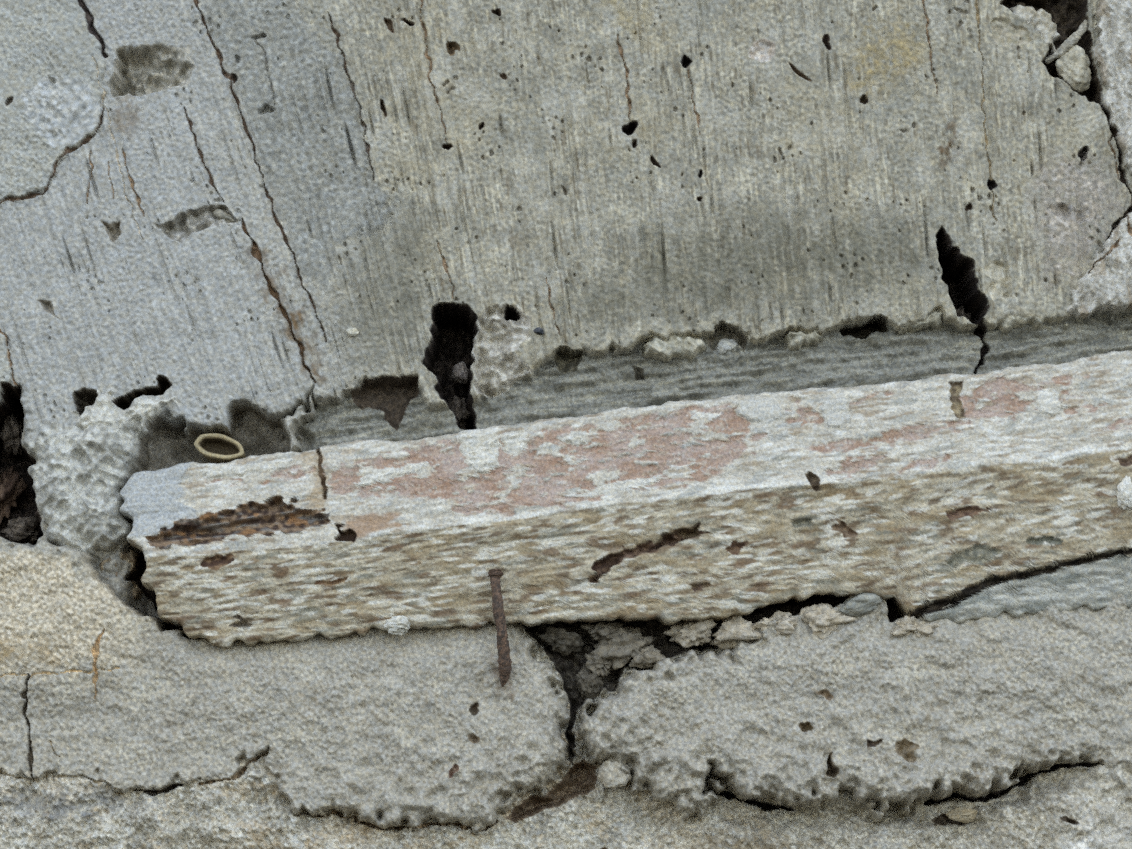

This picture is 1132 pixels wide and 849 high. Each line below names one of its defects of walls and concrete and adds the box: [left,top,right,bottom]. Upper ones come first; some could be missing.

spalling [21,77,104,148]
crack [1,0,145,240]
spalling [108,43,197,98]
crack [185,0,327,384]
crack [1089,103,1132,273]
crack [0,330,20,387]
spalling [0,383,44,545]
spalling [72,387,99,416]
spalling [113,375,173,410]
spalling [351,303,533,475]
crack [974,320,990,374]
crack [0,630,265,796]